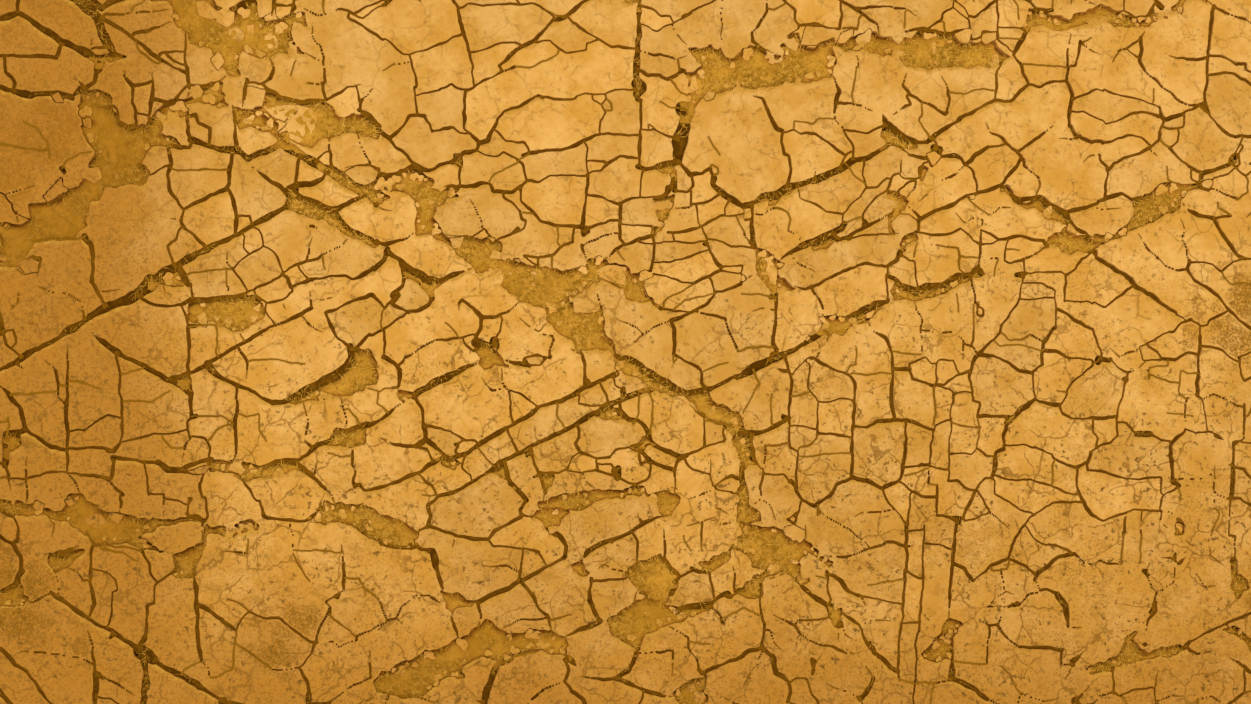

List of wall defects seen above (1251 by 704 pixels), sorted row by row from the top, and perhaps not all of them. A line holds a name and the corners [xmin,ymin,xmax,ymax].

crack [0,0,226,130]
spalling [677,29,1009,124]
crack [0,105,520,541]
spalling [0,0,836,599]
crack [328,349,747,638]
crack [1135,426,1223,479]
crack [1148,328,1251,422]
crack [1209,393,1251,570]
crack [0,475,440,704]
crack [527,649,674,704]
spalling [600,553,710,657]
crack [661,529,822,704]